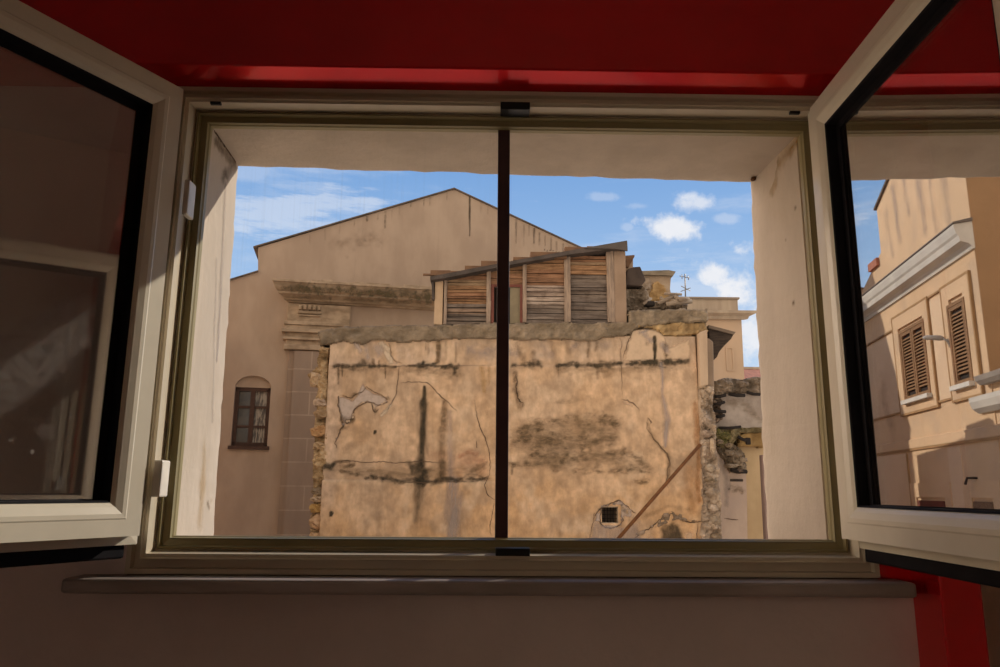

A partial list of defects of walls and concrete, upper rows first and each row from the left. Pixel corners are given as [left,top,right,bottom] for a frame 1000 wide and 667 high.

flaking render [334,385,388,448]
leakage [333,361,396,377]
leakage [323,386,486,537]
crack [381,370,513,536]
leakage [556,336,689,384]
crack [620,339,670,487]